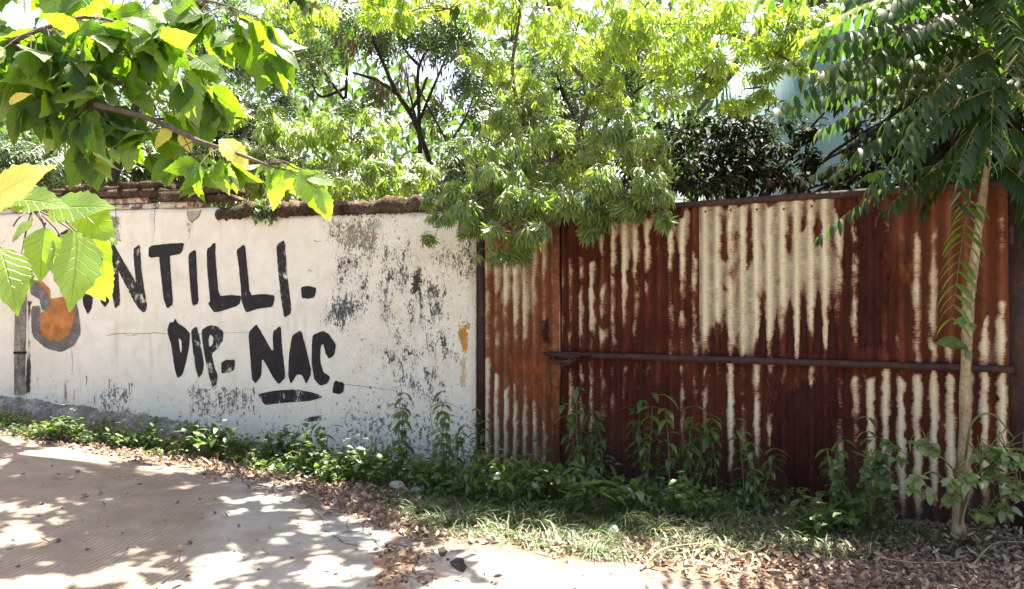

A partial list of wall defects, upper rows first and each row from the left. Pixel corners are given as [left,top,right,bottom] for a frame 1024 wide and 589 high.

water stain [322,214,384,266]
water stain [432,239,481,287]
corrosion [847,197,912,353]
corrosion [458,321,470,387]
corrosion [541,318,550,344]
corrosion [709,322,729,355]
corrosion [758,289,838,355]
corrosion [759,375,840,506]